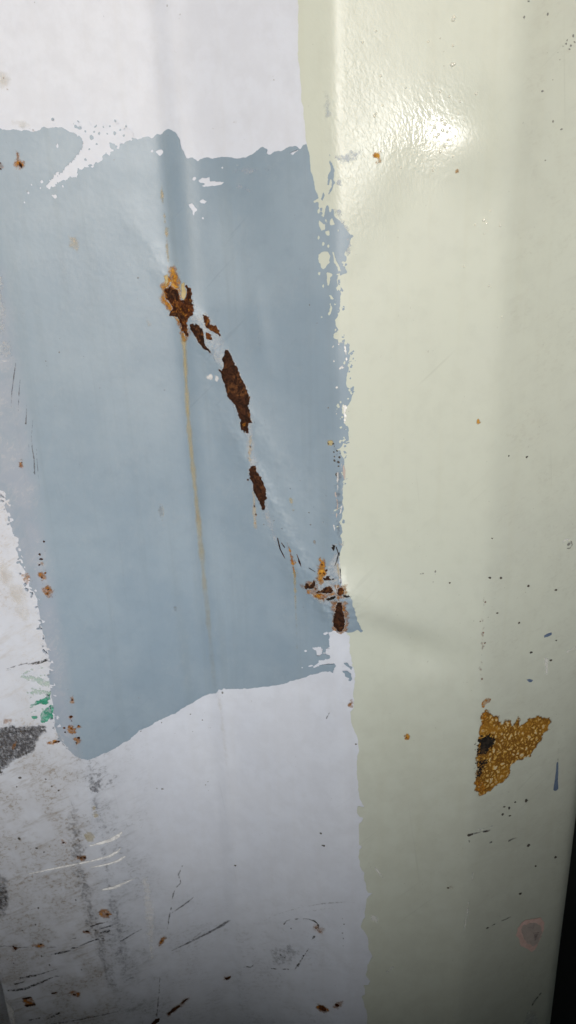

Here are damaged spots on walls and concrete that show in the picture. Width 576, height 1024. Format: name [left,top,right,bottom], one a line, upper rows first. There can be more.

peeling [24,120,134,203]
peeling [189,177,224,219]
rust [161,267,195,375]
peeling [314,198,356,530]
rust [277,538,350,634]
peeling [302,631,356,683]
rust [474,699,552,796]